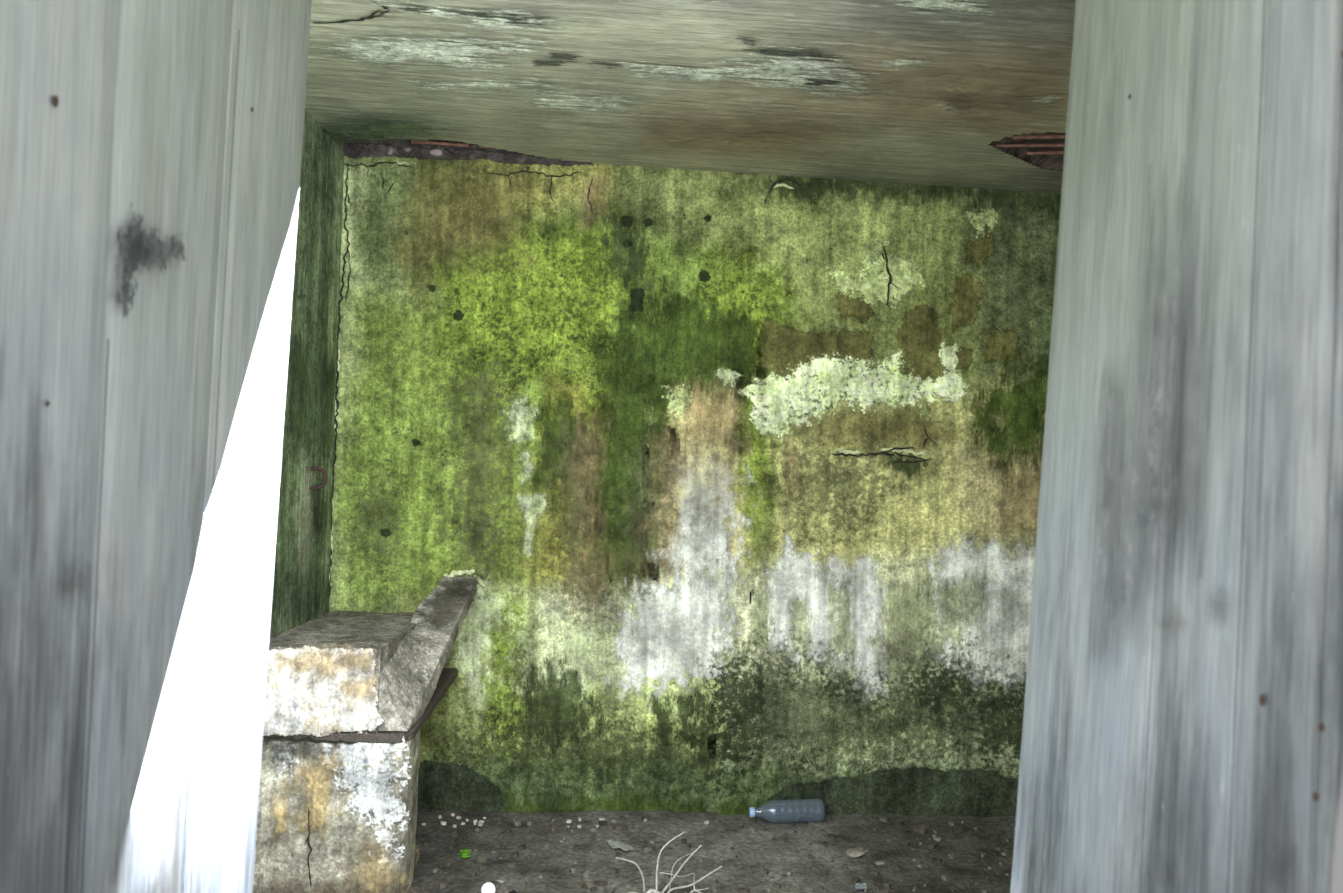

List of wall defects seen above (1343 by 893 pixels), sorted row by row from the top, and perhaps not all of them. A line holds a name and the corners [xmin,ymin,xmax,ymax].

crack [314,0,390,24]
water stain [770,175,1061,220]
water stain [460,211,875,571]
water stain [793,404,957,481]
water stain [897,233,1049,481]
water stain [417,623,1026,817]